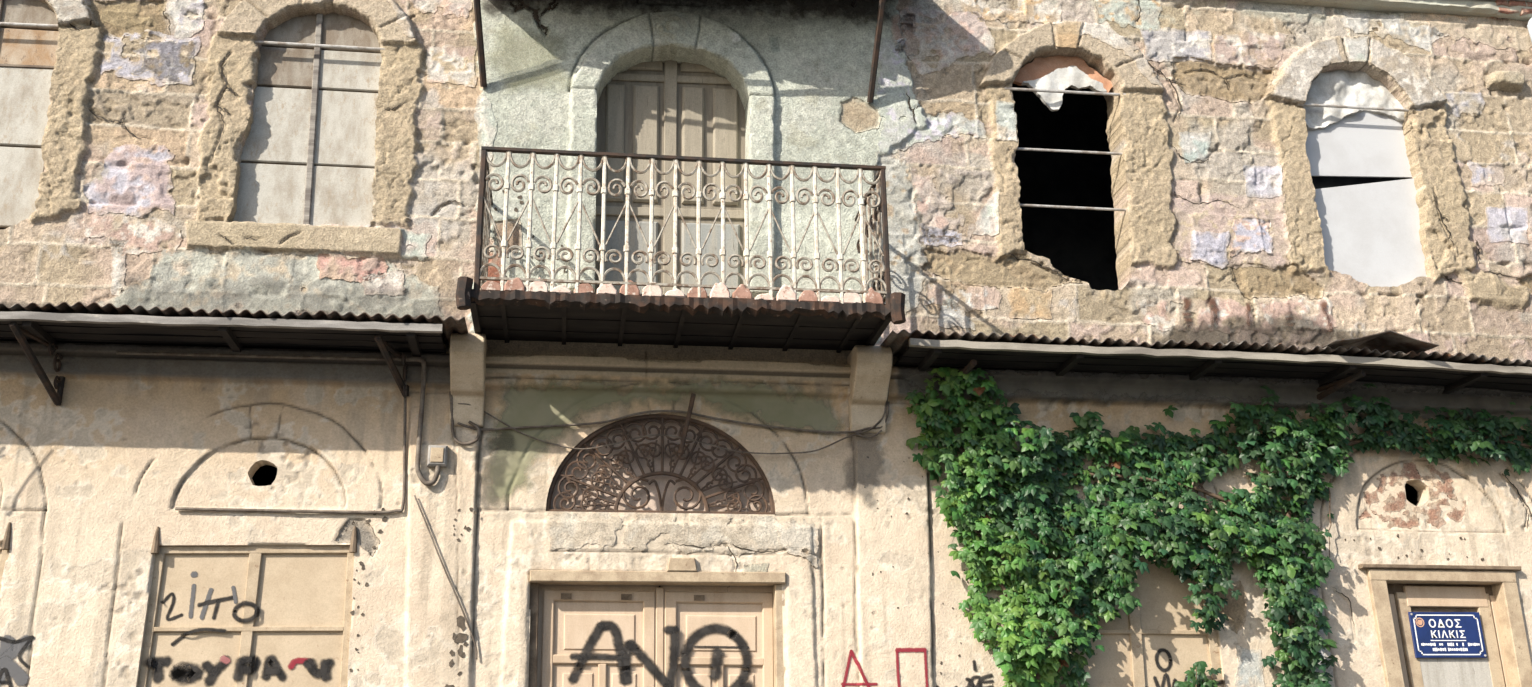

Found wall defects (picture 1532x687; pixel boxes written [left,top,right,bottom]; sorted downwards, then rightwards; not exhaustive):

peeling [48,0,205,87]
crack [211,52,238,161]
peeling [386,0,497,163]
crack [510,0,557,36]
peeling [839,0,1532,333]
leakage [479,379,841,507]
spalling [1358,462,1484,561]
crack [1502,473,1532,526]